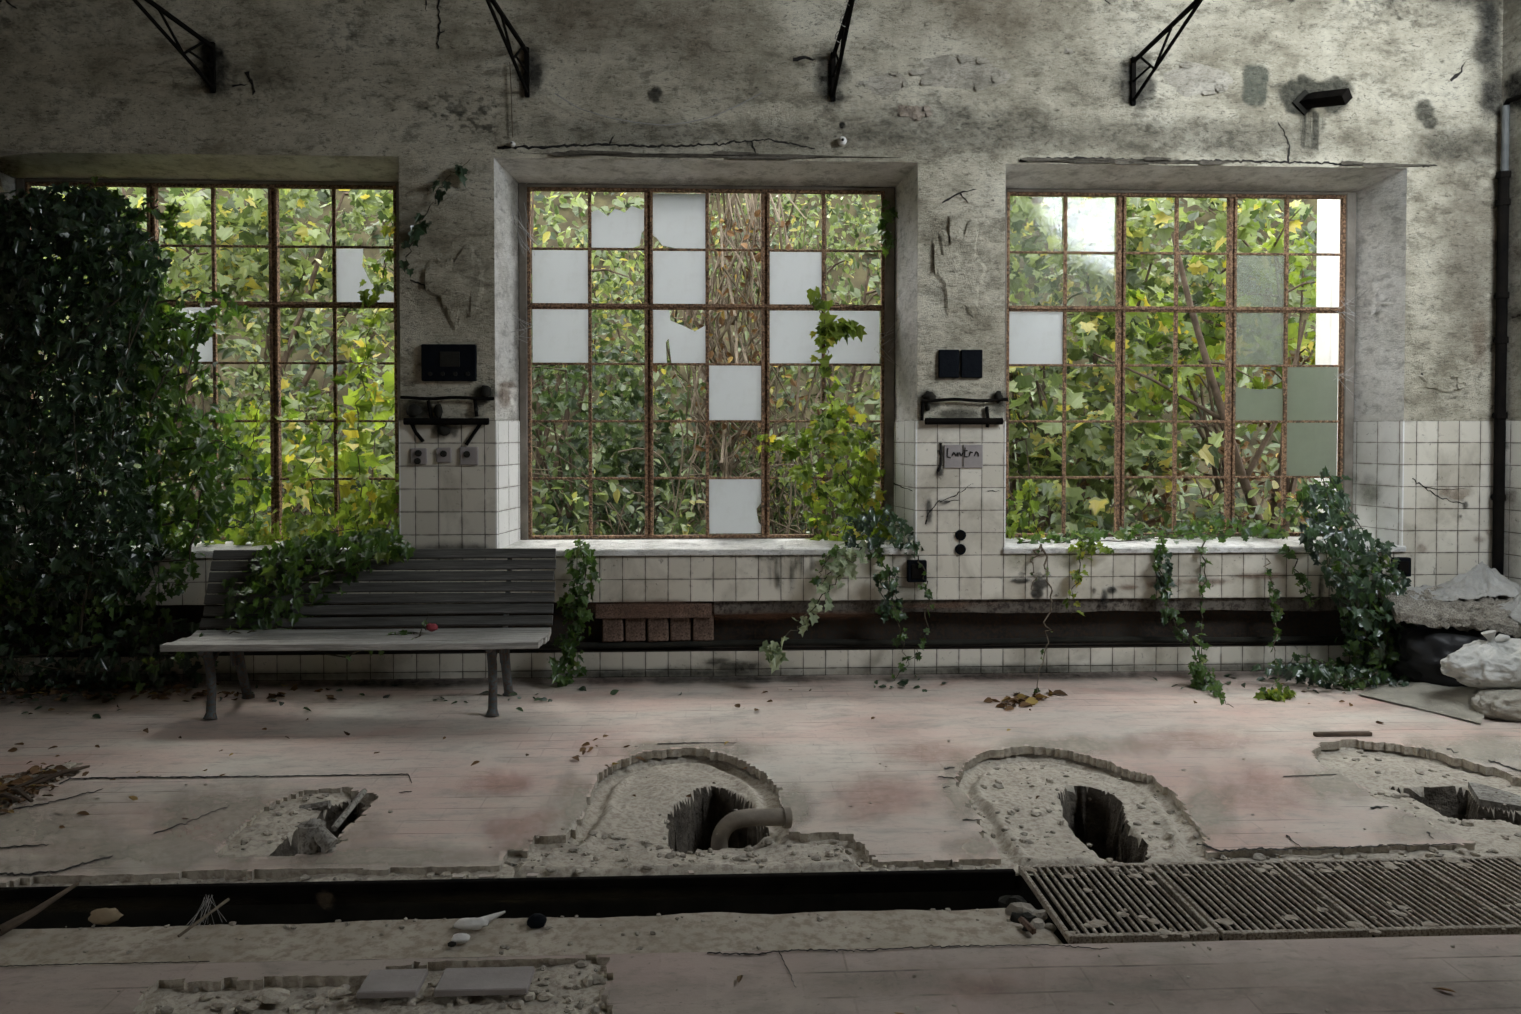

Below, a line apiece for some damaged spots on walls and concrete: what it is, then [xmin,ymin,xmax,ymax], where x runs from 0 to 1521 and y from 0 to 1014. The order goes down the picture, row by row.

water stain [1243,66,1351,148]
water stain [1416,100,1436,128]
water stain [1478,0,1521,117]
spalling [0,762,90,813]
spalling [221,788,373,858]
spalling [482,755,882,878]
spalling [959,754,1218,876]
spalling [1316,747,1521,856]